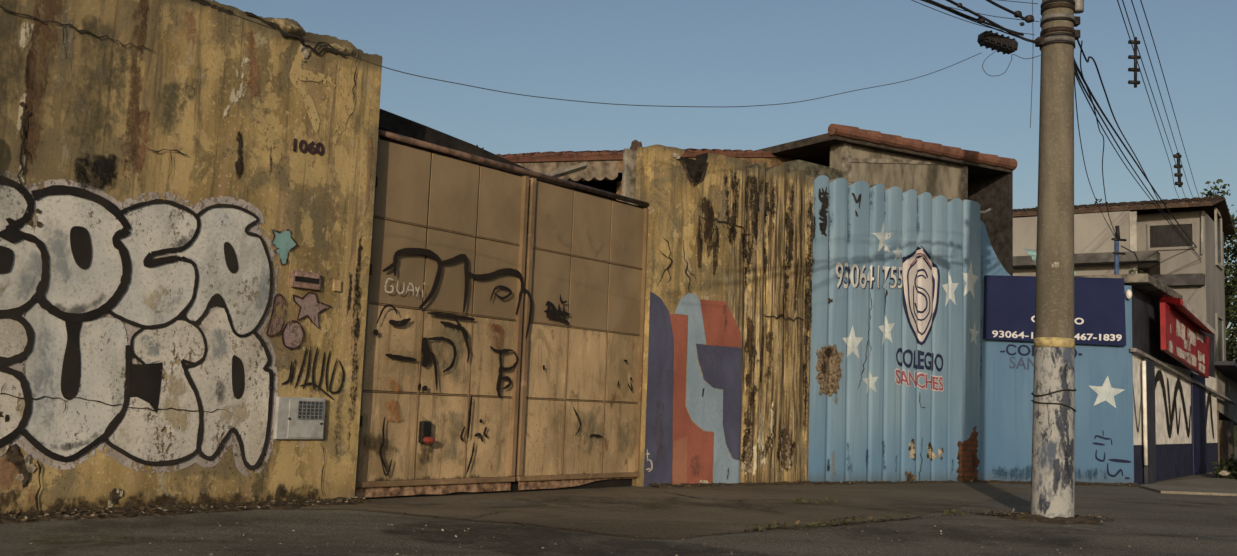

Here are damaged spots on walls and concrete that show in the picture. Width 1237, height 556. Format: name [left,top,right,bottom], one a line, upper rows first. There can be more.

crack [0,5,154,58]
damp [58,16,127,189]
damp [727,317,796,478]
damp [697,173,833,426]
spalling [815,344,844,397]
spalling [905,426,980,481]